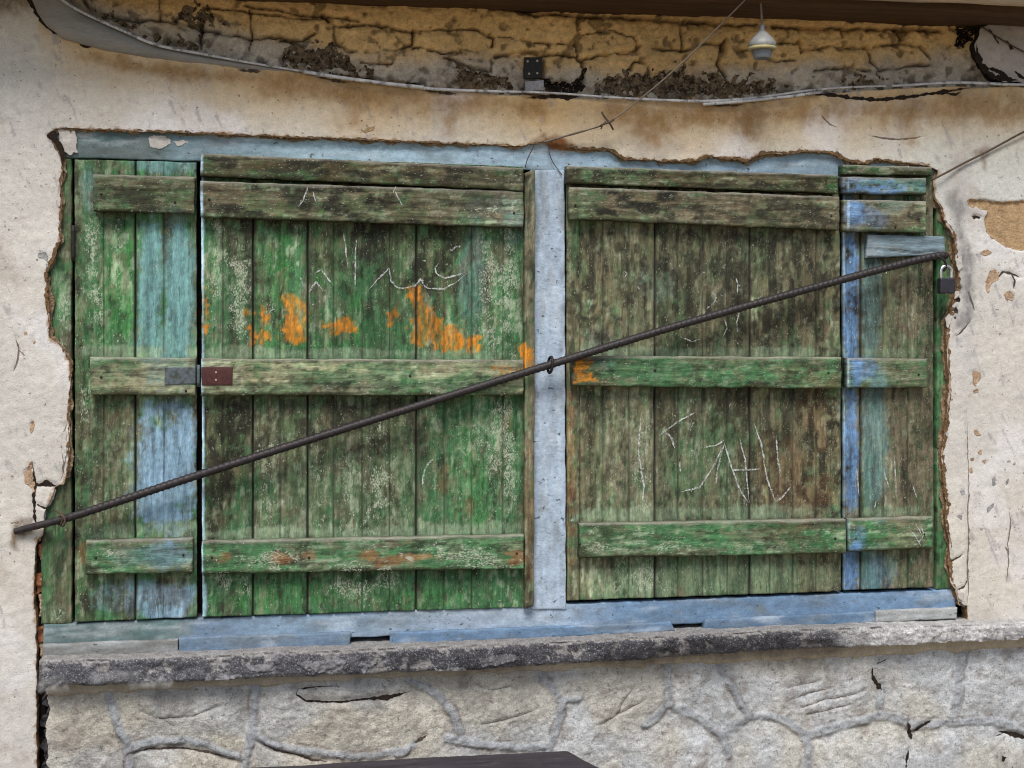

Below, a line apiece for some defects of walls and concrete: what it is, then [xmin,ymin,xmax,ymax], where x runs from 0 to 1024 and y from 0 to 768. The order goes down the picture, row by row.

spalling [23,126,528,519]
spalling [934,194,965,600]
spalling [986,269,999,293]
spalling [967,199,1024,256]